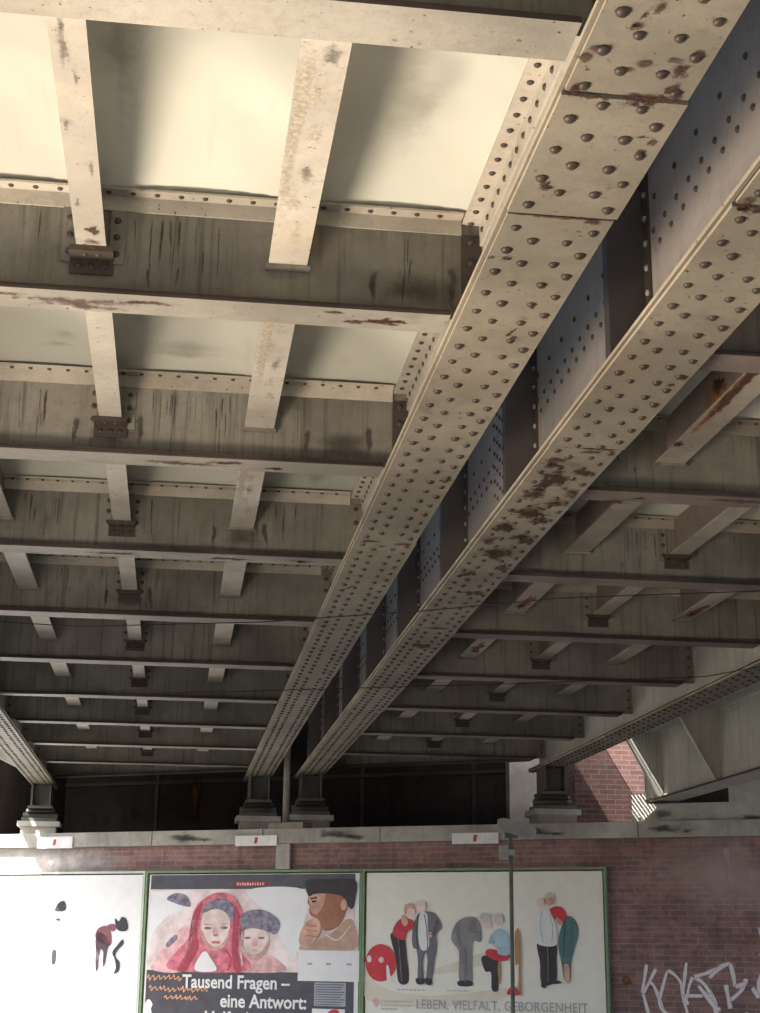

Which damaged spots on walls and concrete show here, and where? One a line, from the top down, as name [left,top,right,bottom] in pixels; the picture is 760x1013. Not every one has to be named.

corrosion [577,47,611,63]
corrosion [625,52,704,109]
corrosion [570,85,608,100]
corrosion [736,198,760,214]
corrosion [28,298,169,310]
corrosion [693,373,759,432]
corrosion [482,458,595,571]